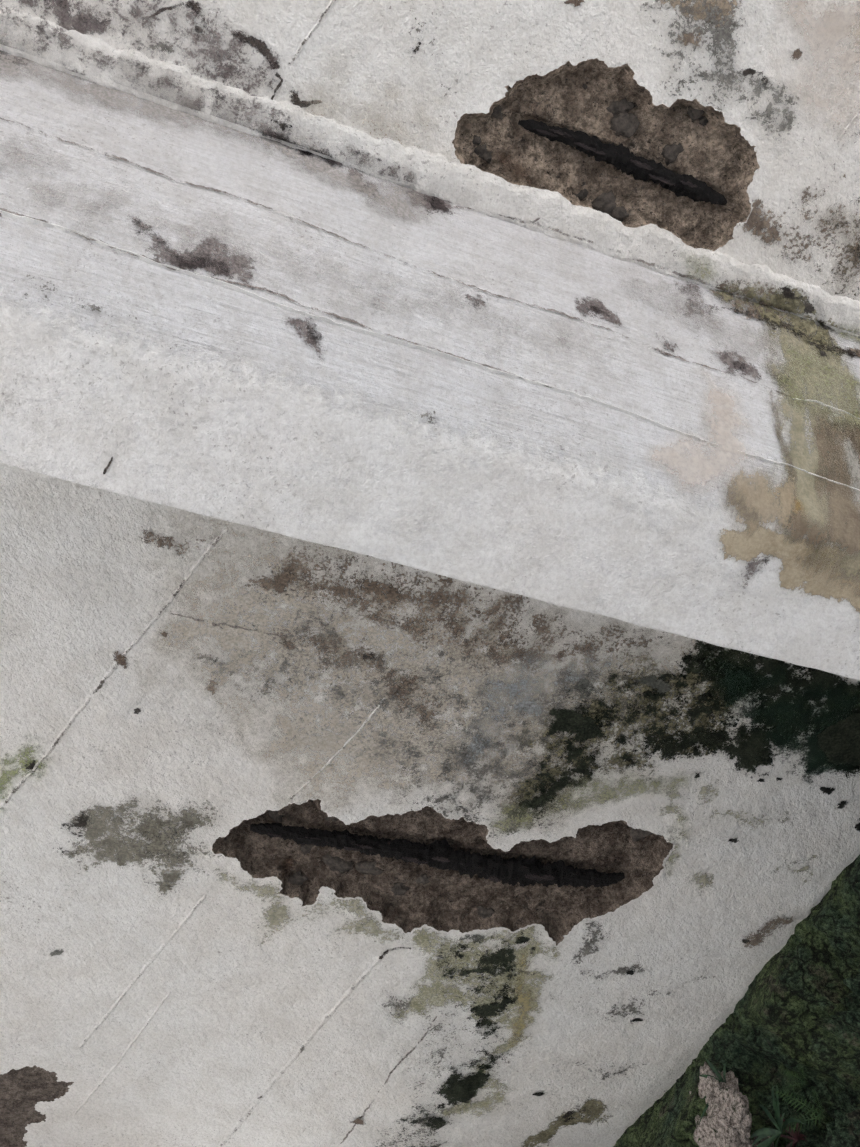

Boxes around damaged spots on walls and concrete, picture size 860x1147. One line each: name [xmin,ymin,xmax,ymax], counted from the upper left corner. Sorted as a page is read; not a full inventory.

spalling [452,58,760,251]
damp [657,186,860,612]
damp [194,542,738,839]
damp [57,795,222,895]
spalling [212,799,673,946]
damp [699,785,789,826]
peeling [0,1065,74,1147]
damp [351,921,647,1147]